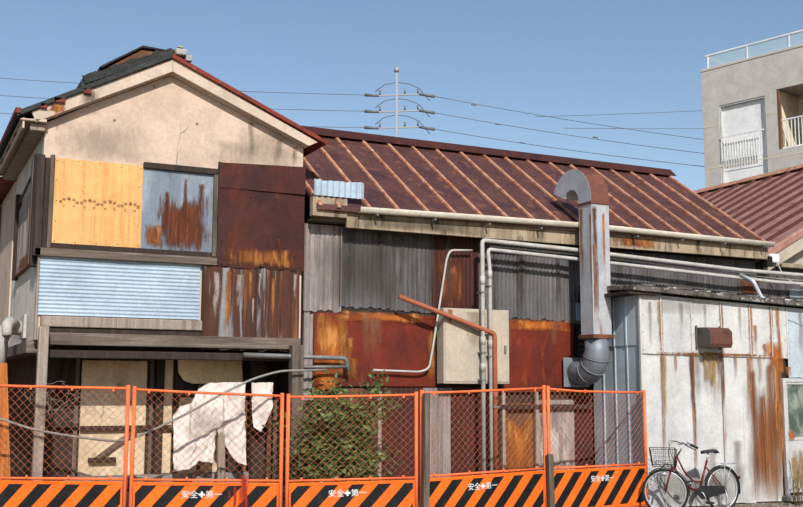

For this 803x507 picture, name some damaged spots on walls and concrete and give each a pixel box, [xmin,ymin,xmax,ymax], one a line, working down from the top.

corrosion [146,180,209,251]
corrosion [218,162,306,323]
corrosion [316,311,357,390]
corrosion [359,312,420,323]
corrosion [517,320,567,331]
corrosion [658,301,803,490]